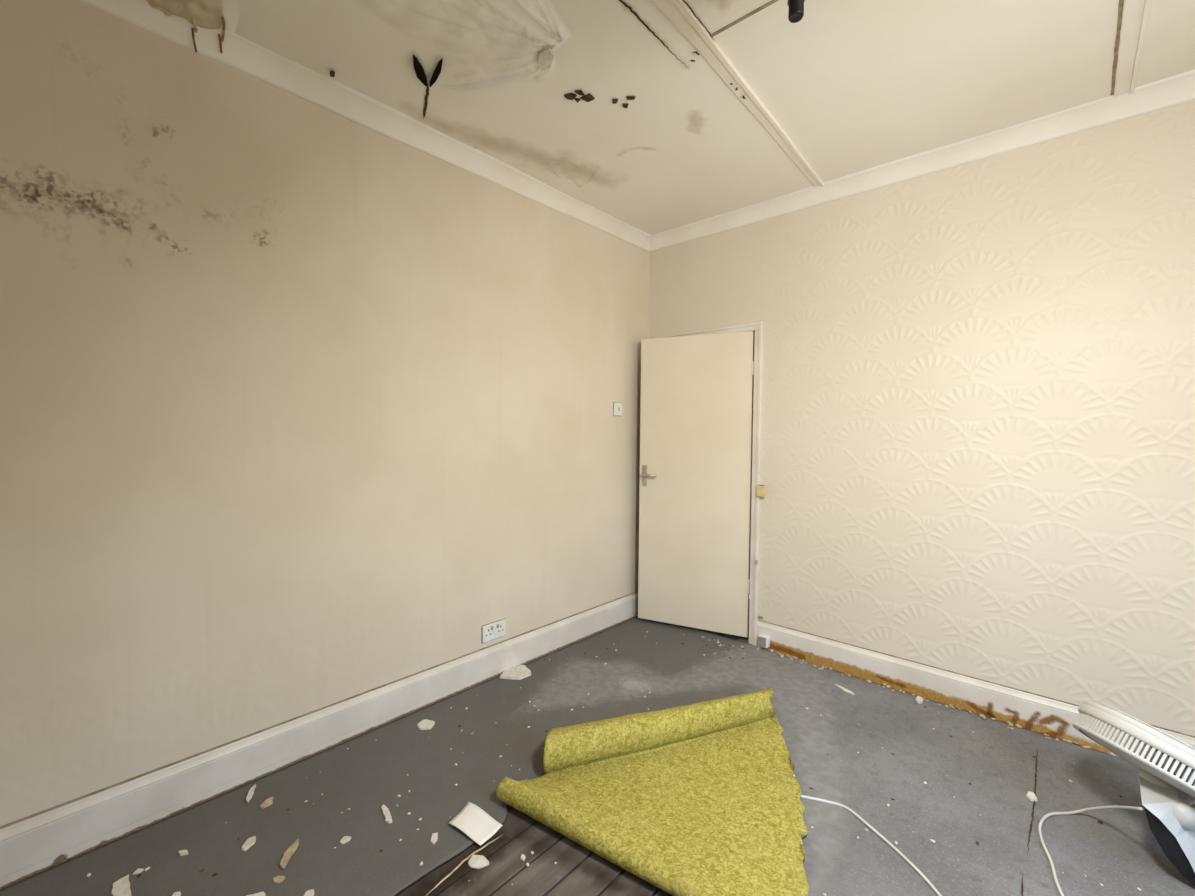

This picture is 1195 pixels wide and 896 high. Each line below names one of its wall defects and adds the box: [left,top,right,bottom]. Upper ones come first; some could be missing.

spalling [148,0,223,29]